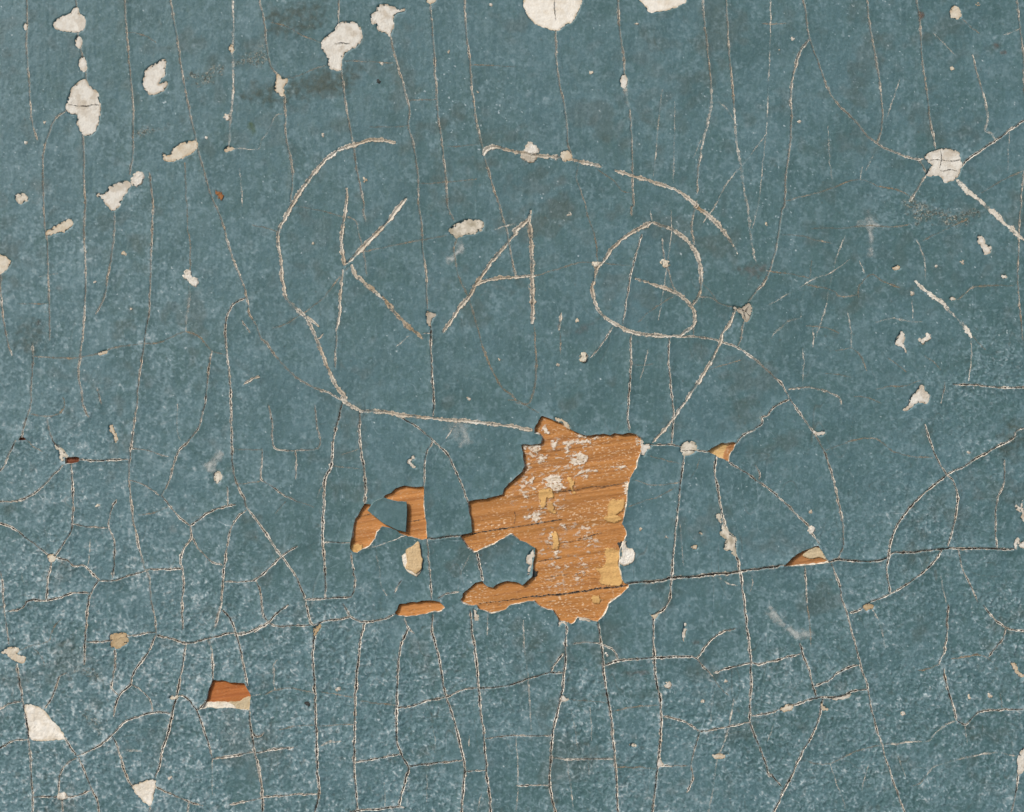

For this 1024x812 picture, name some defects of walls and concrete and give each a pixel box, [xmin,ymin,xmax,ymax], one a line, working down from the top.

crack [0,0,115,471]
peeling [53,7,101,136]
peeling [321,4,405,71]
crack [384,0,544,503]
peeling [523,0,582,31]
crack [590,234,647,429]
crack [658,0,763,320]
crack [780,0,1024,236]
peeling [925,148,962,183]
peeling [461,417,651,627]
peeling [24,704,65,741]
crack [920,596,1024,728]